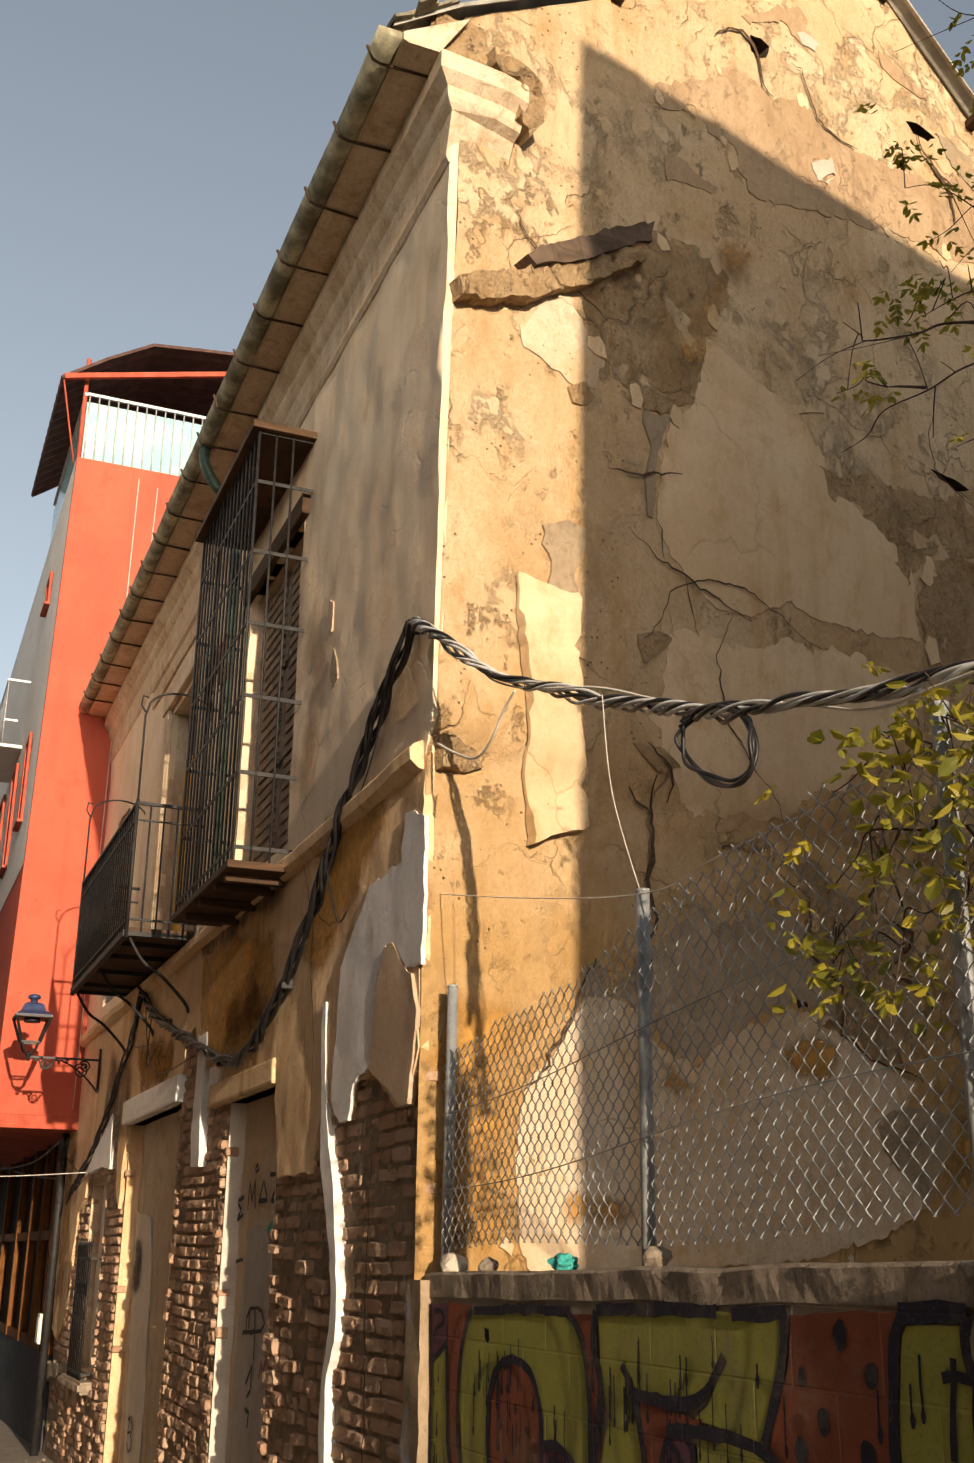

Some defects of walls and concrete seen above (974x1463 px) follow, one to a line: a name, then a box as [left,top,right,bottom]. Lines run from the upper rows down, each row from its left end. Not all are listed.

flaking render [654,65,974,264]
flaking render [519,211,731,518]
crack [608,467,682,477]
crack [629,519,822,826]
flaking render [818,465,974,676]
flaking render [45,1124,136,1463]
flaking render [153,1036,239,1463]
water stain [201,888,279,1066]
flaking render [256,942,440,1463]
flaking render [499,835,953,1271]
crack [781,875,924,1083]
crack [893,921,934,1010]